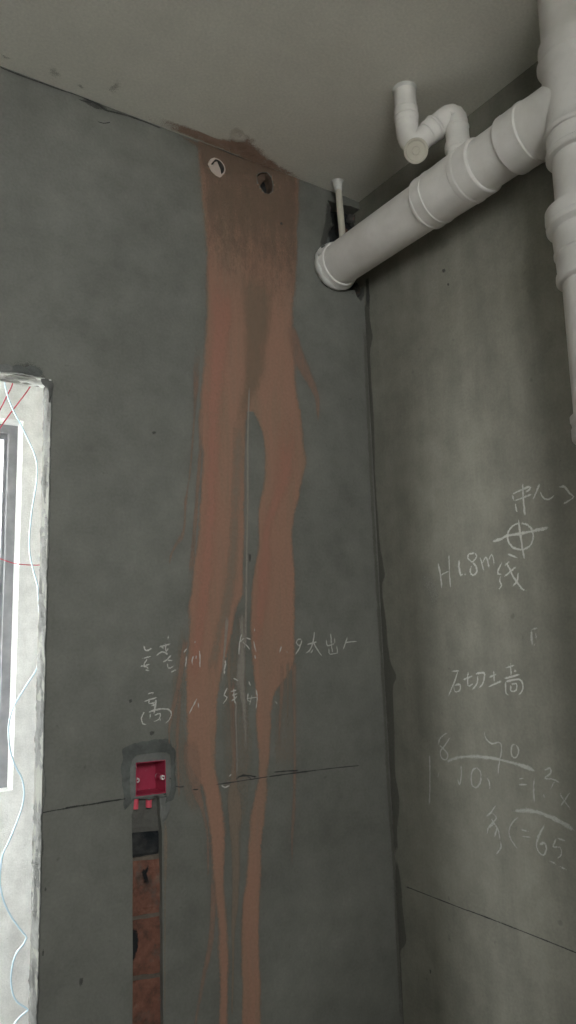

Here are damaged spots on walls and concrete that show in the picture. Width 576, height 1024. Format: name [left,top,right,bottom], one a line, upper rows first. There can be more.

rust [168,141,320,1024]